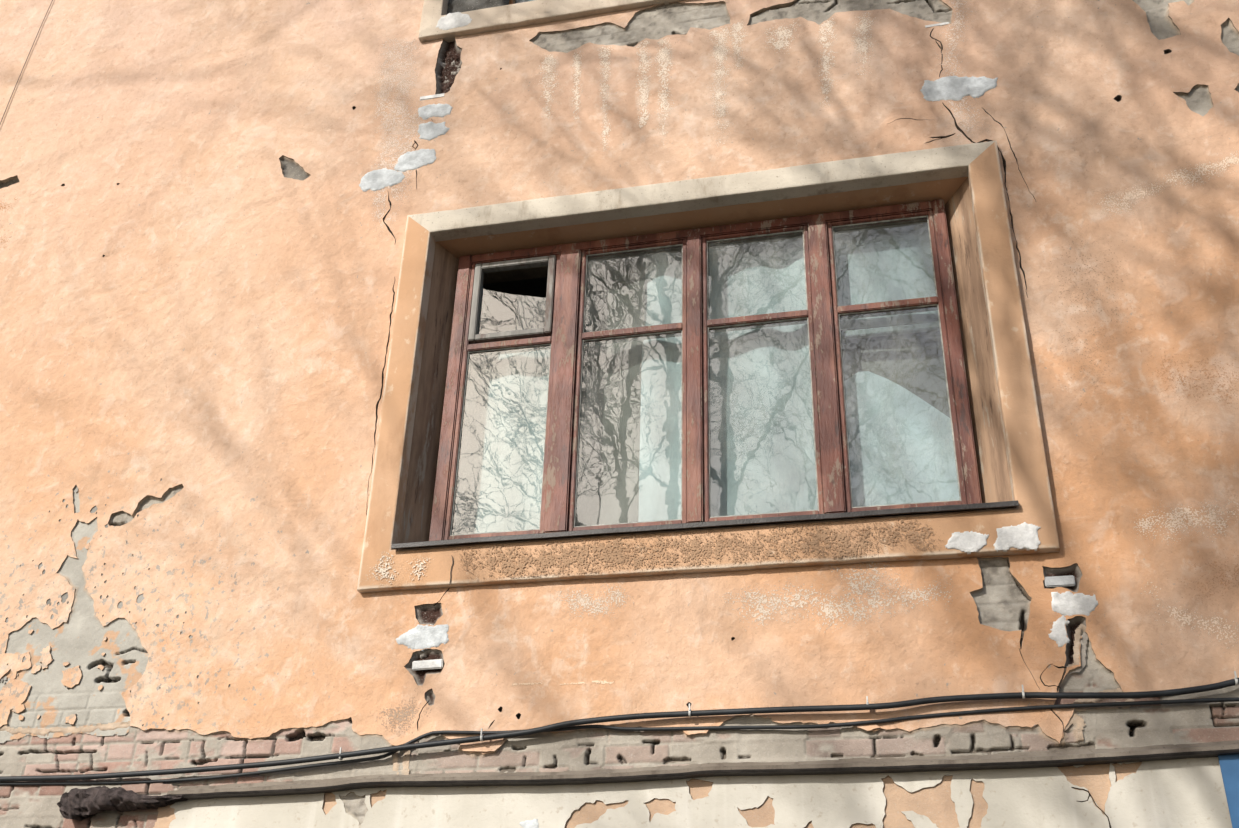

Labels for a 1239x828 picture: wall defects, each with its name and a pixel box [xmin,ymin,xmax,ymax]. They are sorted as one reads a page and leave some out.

flaking render [0,479,1239,828]